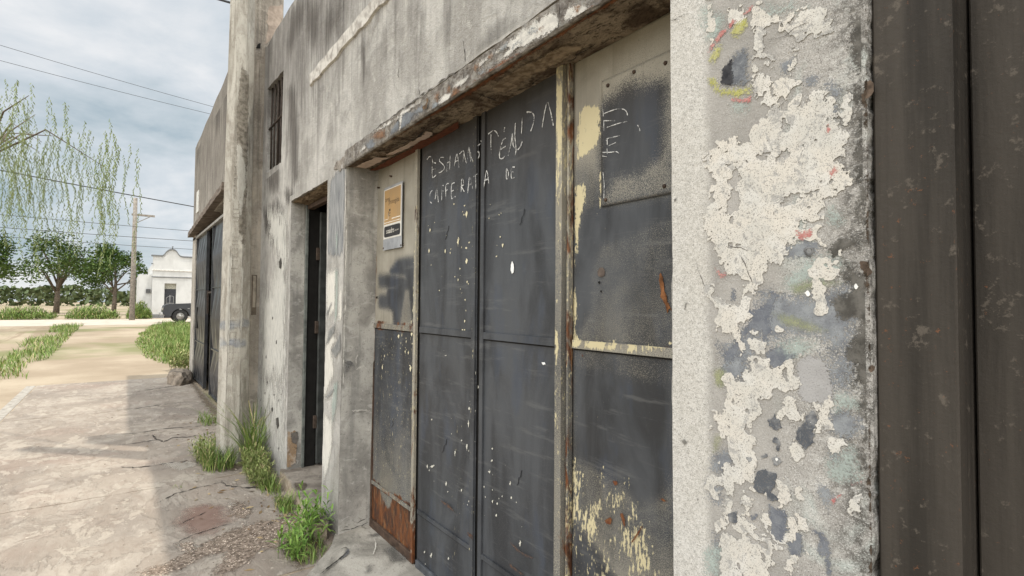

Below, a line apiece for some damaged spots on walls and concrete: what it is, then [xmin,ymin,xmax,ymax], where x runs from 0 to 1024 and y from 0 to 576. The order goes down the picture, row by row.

peeling [478,5,591,66]
spalling [492,45,585,92]
peeling [377,76,468,130]
flaking render [334,132,433,171]
peeling [702,0,874,576]
crack [132,318,241,468]